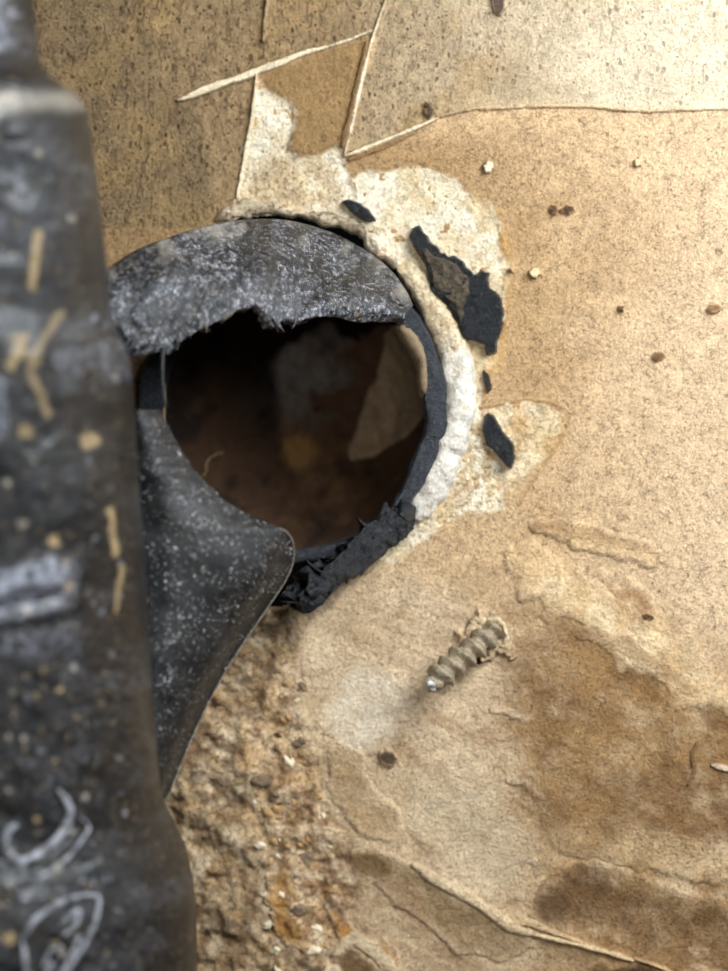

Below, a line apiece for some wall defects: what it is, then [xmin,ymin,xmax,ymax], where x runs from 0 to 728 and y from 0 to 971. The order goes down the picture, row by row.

crack [175,0,439,200]
flaking render [233,86,575,566]
water stain [297,516,728,971]
crack [411,860,673,971]